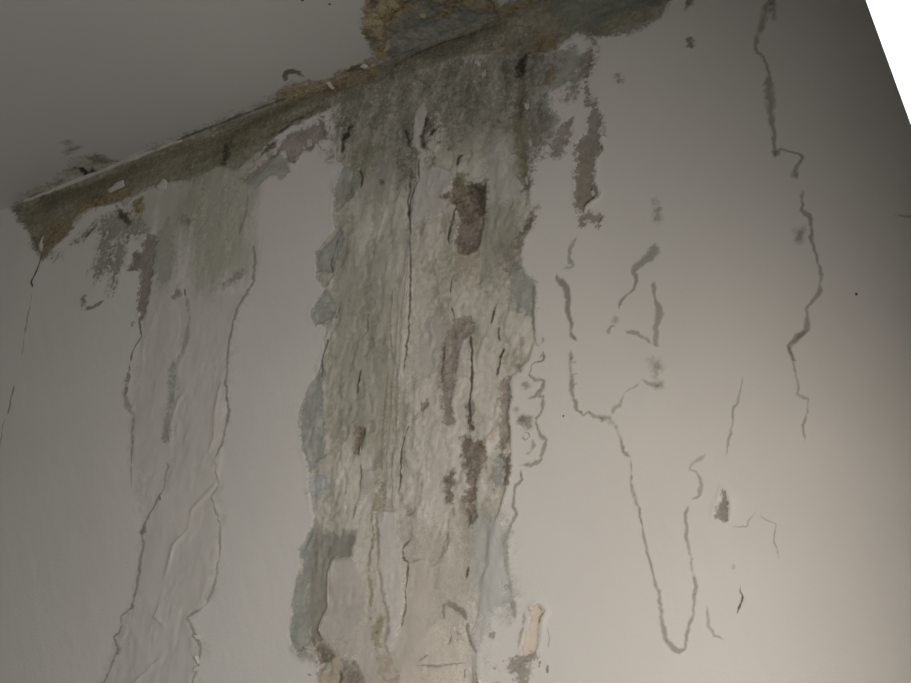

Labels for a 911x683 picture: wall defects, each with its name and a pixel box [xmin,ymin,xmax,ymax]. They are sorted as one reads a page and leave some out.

damp [11,0,669,260]
damp [86,227,159,395]
flaking render [242,0,546,683]
damp [559,280,576,340]